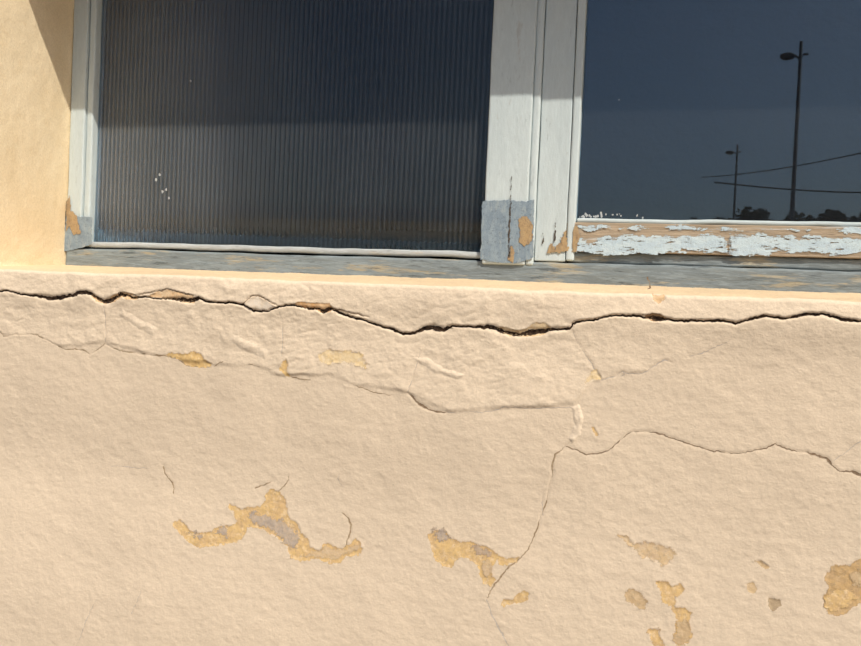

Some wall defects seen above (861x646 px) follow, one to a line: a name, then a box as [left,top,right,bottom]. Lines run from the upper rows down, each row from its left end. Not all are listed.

peeling [508,216,533,263]
peeling [165,351,211,368]
crack [0,288,861,413]
crack [111,465,174,494]
peeling [173,489,362,565]
peeling [428,527,519,587]
peeling [617,534,677,567]
crack [486,431,861,646]
peeling [624,588,648,610]
peeling [646,580,693,646]
peeling [823,559,861,616]